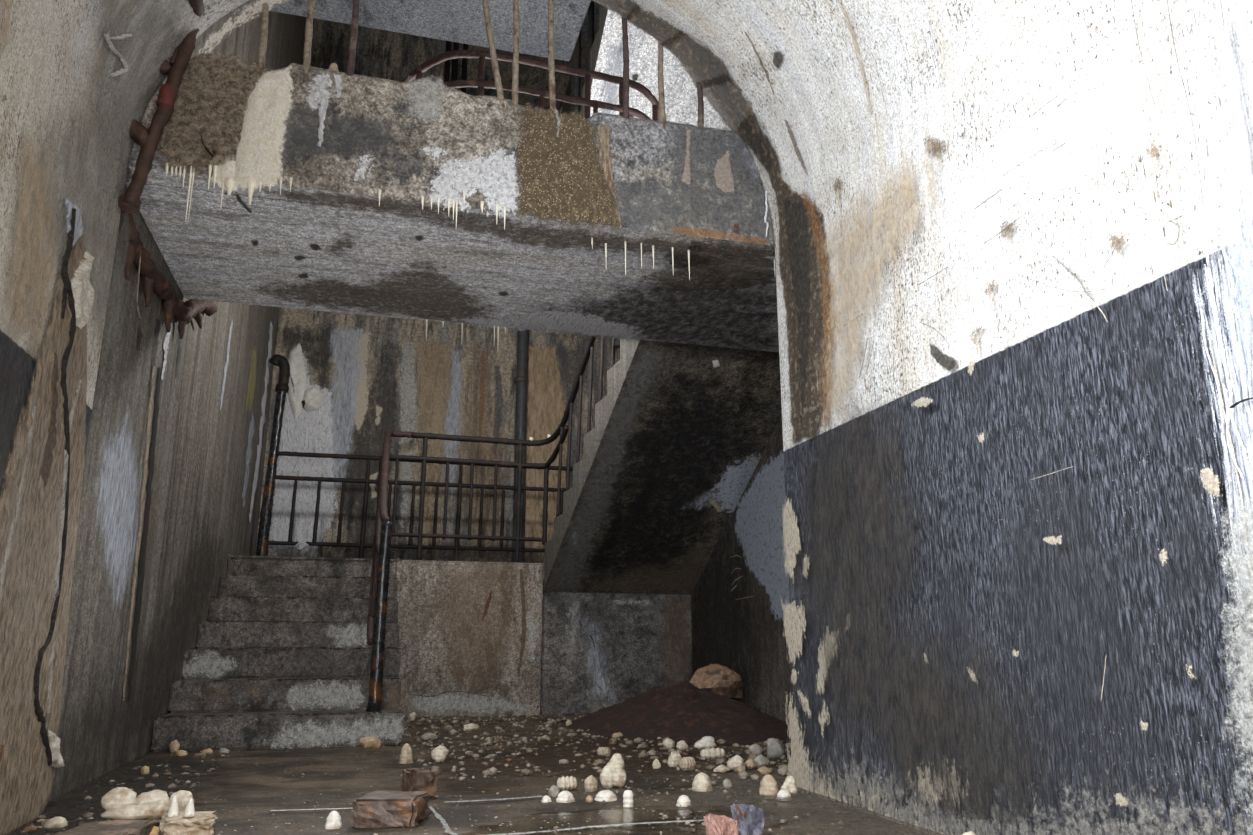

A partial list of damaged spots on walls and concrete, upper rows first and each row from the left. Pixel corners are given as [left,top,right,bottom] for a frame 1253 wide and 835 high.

damp [197,0,288,54]
spalling [681,128,693,184]
spalling [711,150,736,195]
crack [33,208,95,770]
damp [263,680,404,748]
damp [326,622,367,648]
damp [211,0,919,591]
damp [593,534,750,674]
corrosion [802,191,835,423]
peeling [683,451,1022,835]
damp [665,408,1253,835]
damp [1181,0,1253,794]